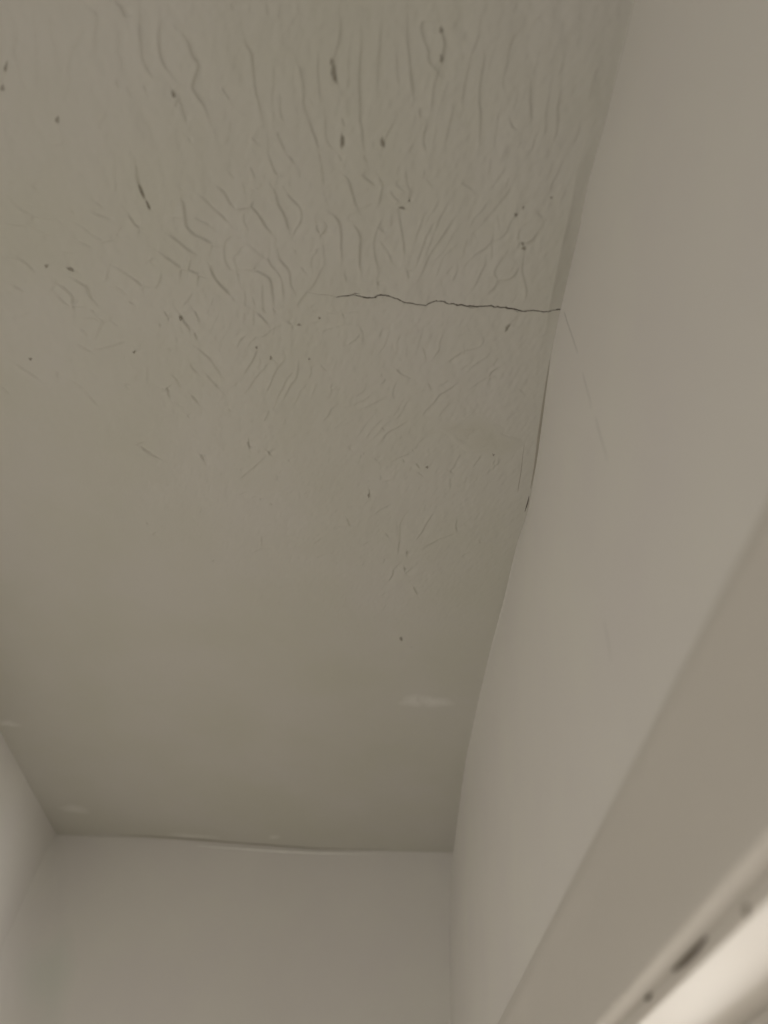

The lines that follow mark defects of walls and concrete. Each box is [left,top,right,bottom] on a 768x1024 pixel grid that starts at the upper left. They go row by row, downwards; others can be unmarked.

crack [313,293,560,313]